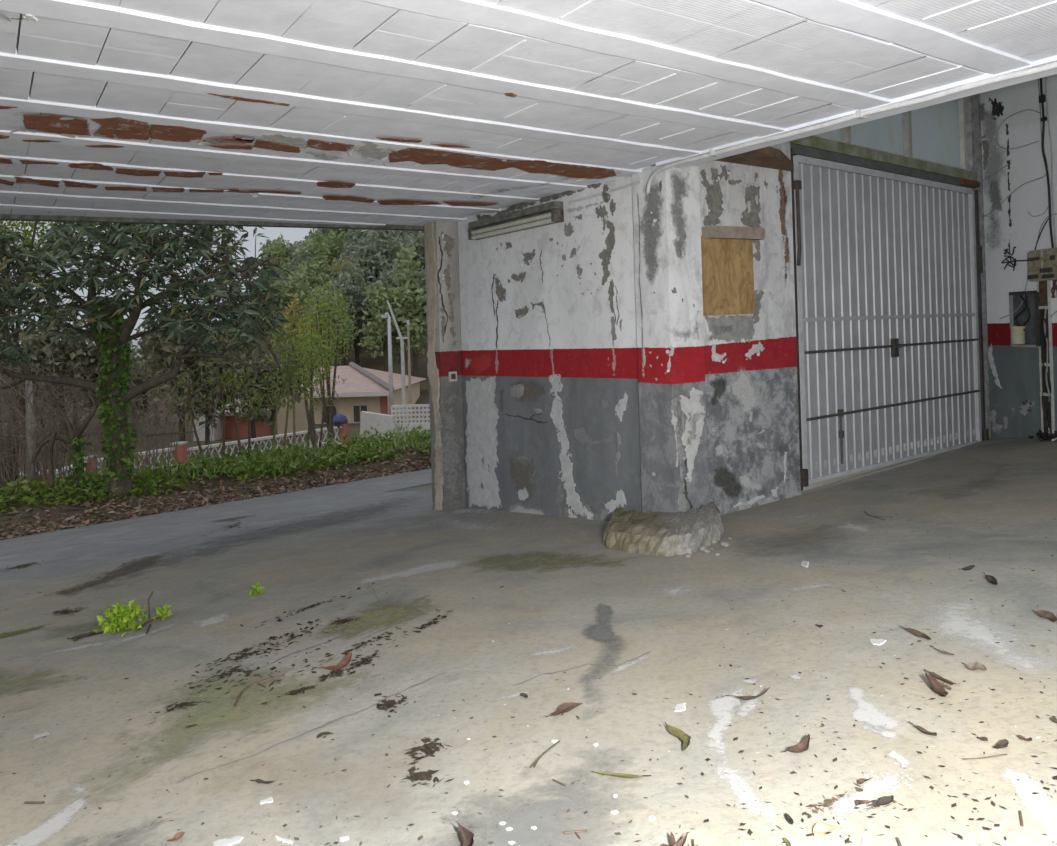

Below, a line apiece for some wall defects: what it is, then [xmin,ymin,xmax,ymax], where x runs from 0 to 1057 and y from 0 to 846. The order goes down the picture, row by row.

peeling [204,92,290,106]
peeling [0,106,622,376]
peeling [700,165,789,263]
peeling [705,290,765,363]
peeling [465,351,502,509]
crack [506,413,548,423]
flaking render [548,349,594,520]
peeling [615,388,628,476]
flaking render [605,489,627,513]
leakage [523,604,649,680]
leakage [451,773,606,846]